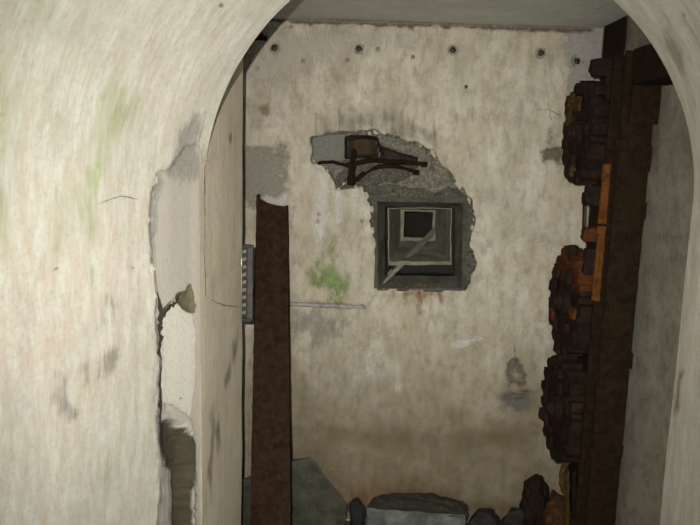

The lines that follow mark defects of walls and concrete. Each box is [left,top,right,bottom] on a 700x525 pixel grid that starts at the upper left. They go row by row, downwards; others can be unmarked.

spalling [310,129,477,291]
crack [157,292,179,452]
flaking render [148,120,209,525]